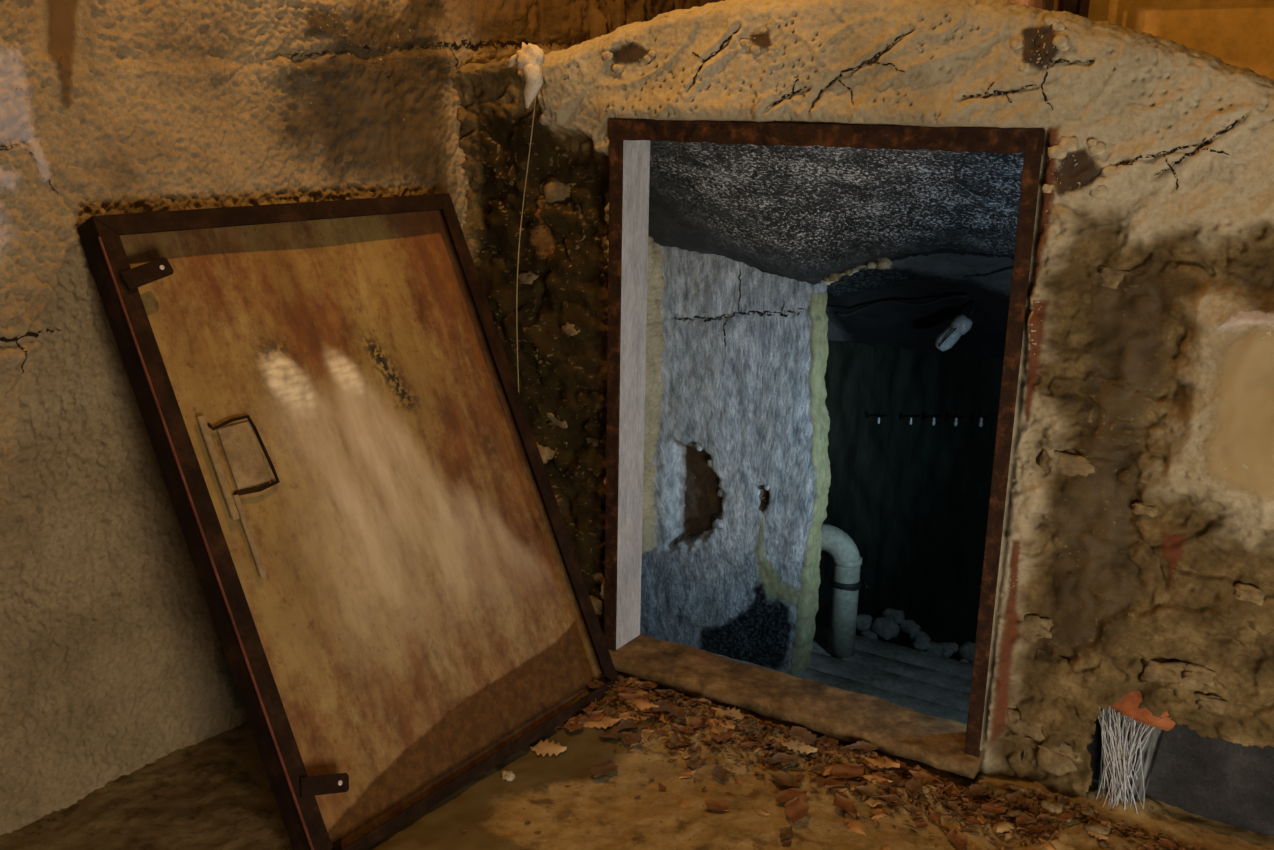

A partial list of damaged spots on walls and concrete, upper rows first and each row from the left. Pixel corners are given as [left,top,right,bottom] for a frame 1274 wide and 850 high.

crack [0,140,58,193]
crack [890,249,1014,277]
crack [674,271,807,345]
crack [0,328,60,373]
flaking render [477,115,608,621]
spalling [679,443,723,542]
spalling [758,484,770,512]